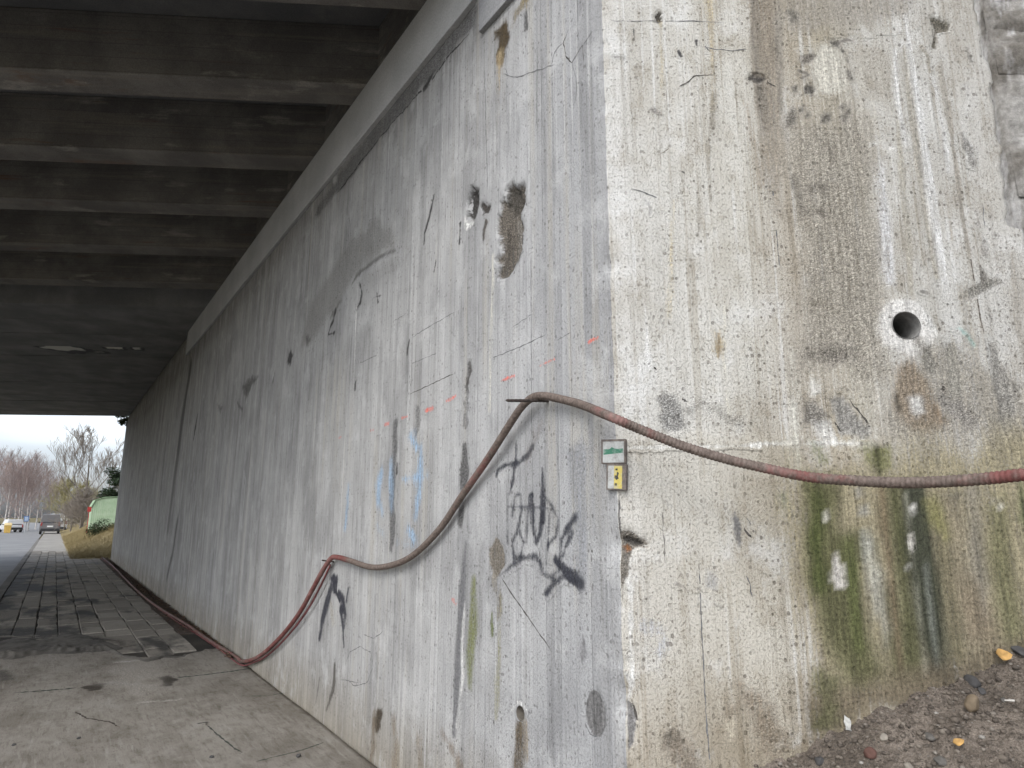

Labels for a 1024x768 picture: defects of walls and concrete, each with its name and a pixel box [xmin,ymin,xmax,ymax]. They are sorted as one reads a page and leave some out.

rust [491,0,533,136]
crack [484,31,591,118]
spalling [458,178,528,283]
damp [627,0,1024,768]
peeling [617,492,679,754]